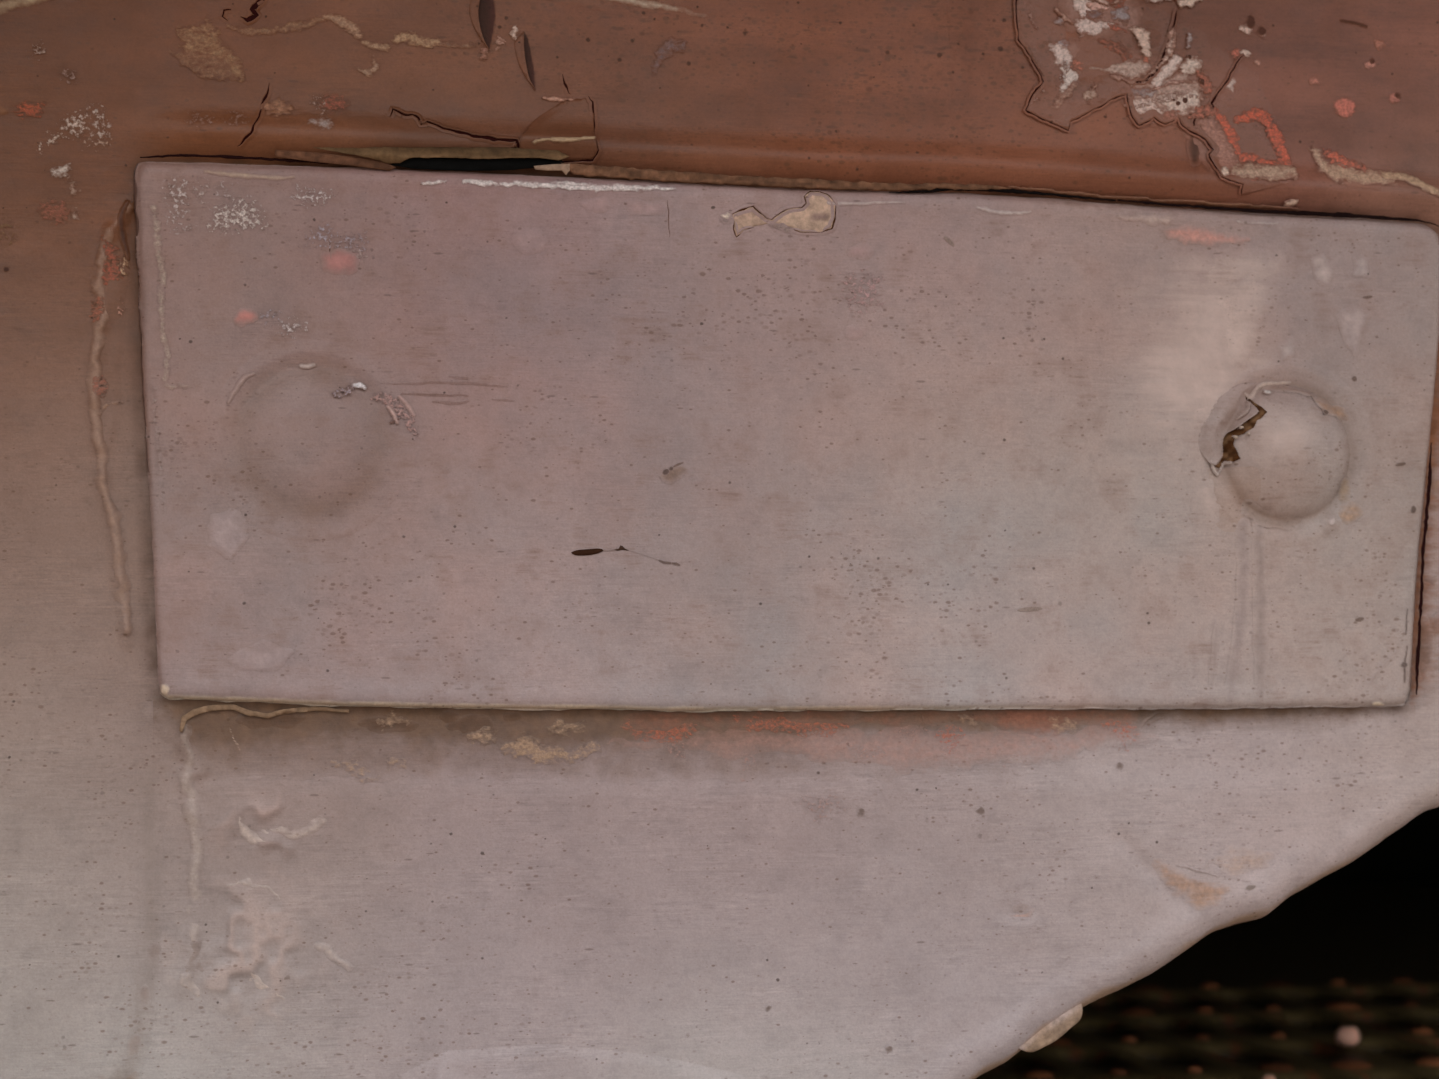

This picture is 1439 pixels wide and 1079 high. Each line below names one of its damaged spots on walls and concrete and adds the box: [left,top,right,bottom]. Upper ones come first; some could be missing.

crack [218,0,268,26]
crack [469,0,572,97]
crack [140,82,329,164]
crack [387,106,520,148]
peeling [1013,0,1439,197]
peeling [161,92,1032,253]
crack [889,185,1439,227]
peeling [1082,212,1335,526]
rust [601,709,1162,776]